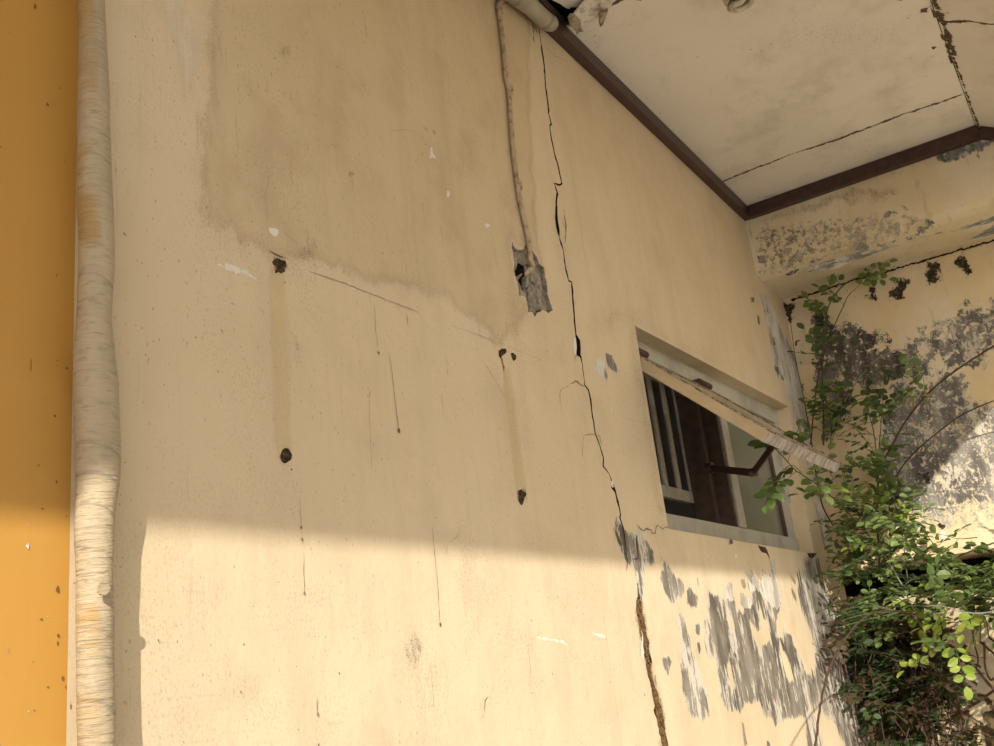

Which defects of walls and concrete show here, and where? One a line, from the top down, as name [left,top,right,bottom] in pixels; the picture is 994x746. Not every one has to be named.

spalling [512,242,553,316]
crack [533,25,666,534]
water stain [783,302,795,323]
water stain [865,277,910,301]
water stain [924,260,941,285]
water stain [955,256,972,275]
peeling [594,353,620,381]
peeling [750,289,994,533]
peeling [613,460,874,746]
crack [635,574,668,746]